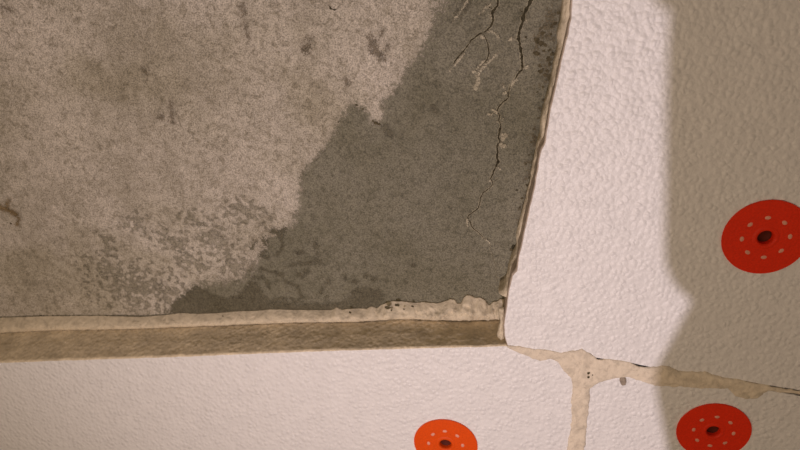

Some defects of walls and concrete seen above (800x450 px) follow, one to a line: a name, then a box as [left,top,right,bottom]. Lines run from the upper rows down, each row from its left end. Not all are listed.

damp [76,0,562,316]
crack [449,0,534,278]
spalling [513,0,561,225]